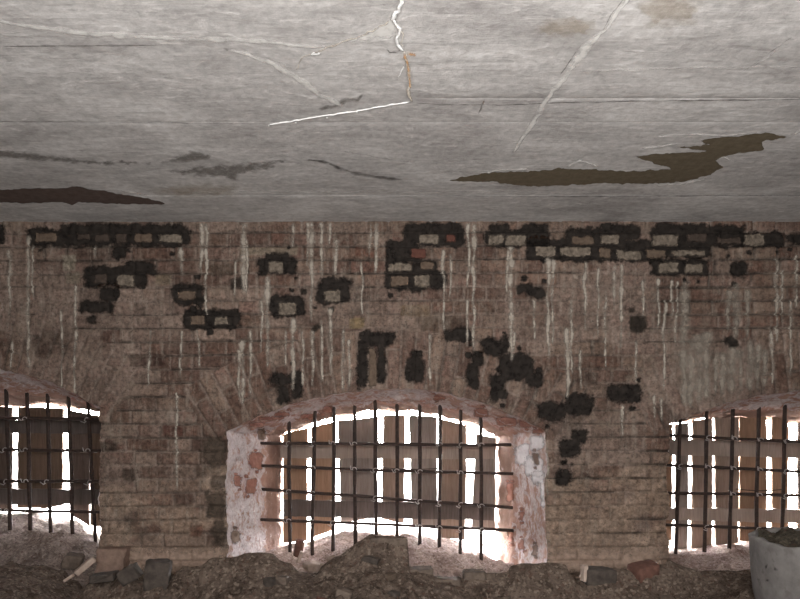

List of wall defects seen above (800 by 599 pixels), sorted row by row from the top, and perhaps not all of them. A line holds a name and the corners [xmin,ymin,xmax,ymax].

crack [0,21,48,30]
crack [69,31,173,46]
crack [211,0,484,127]
crack [513,0,628,151]
leakage [0,225,12,308]
leakage [26,222,241,393]
leakage [231,223,396,405]
leakage [368,221,800,434]
peeling [234,409,291,498]
leakage [525,429,589,507]